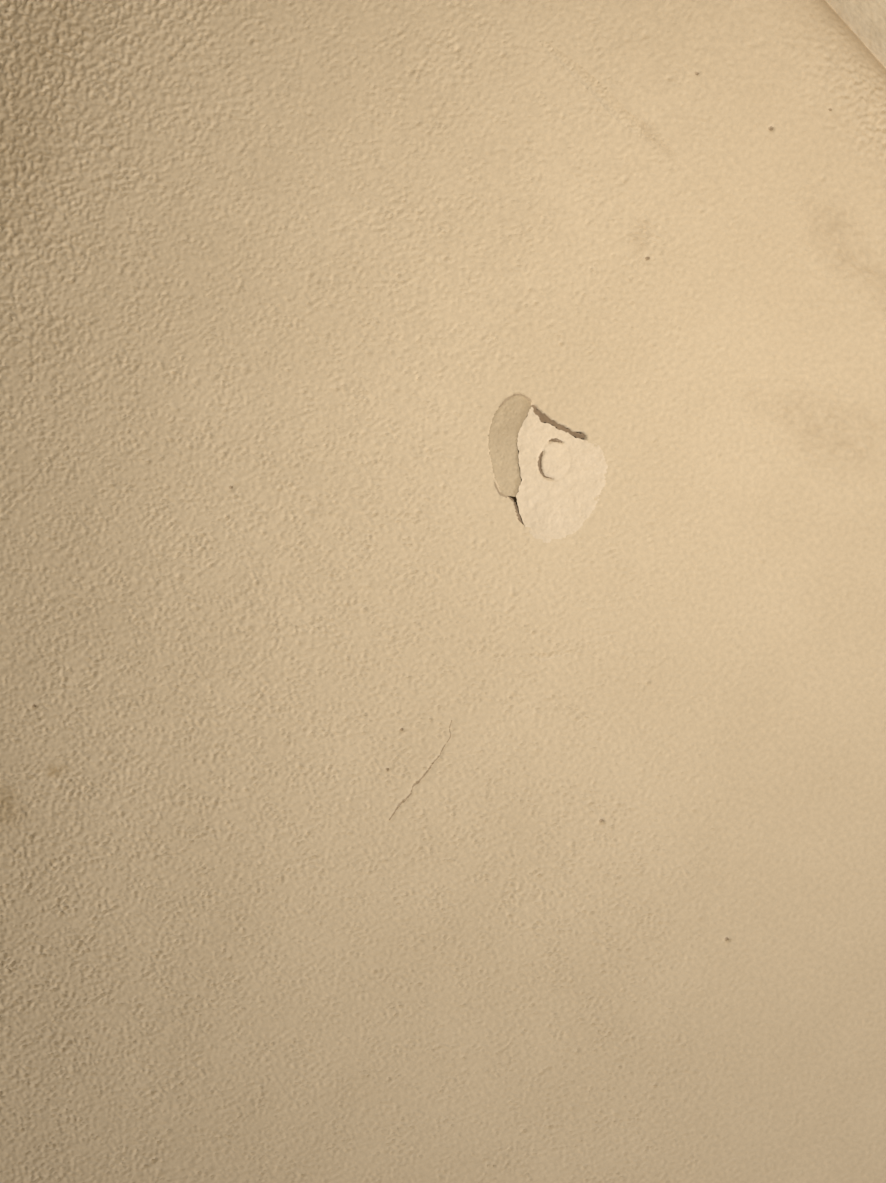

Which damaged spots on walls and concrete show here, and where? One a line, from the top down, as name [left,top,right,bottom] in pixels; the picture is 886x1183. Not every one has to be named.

flaking render [488,393,608,543]